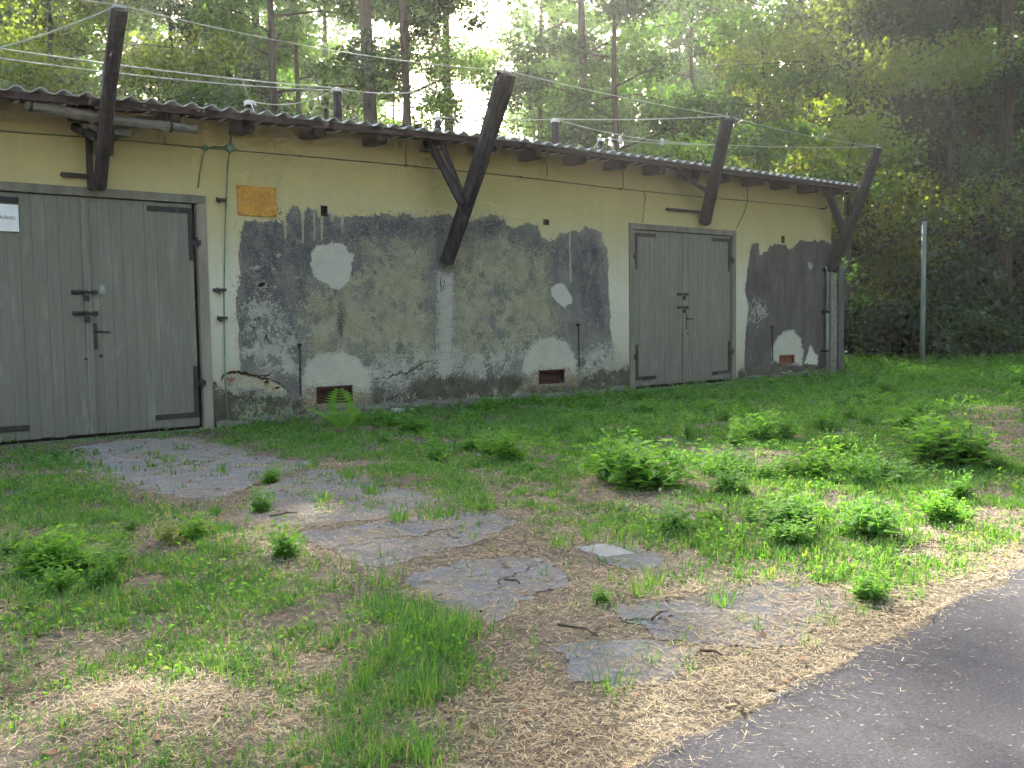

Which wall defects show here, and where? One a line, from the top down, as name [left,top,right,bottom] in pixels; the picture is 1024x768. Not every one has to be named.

crack [377,360,433,379]
peeling [226,205,613,402]
peeling [744,239,836,376]